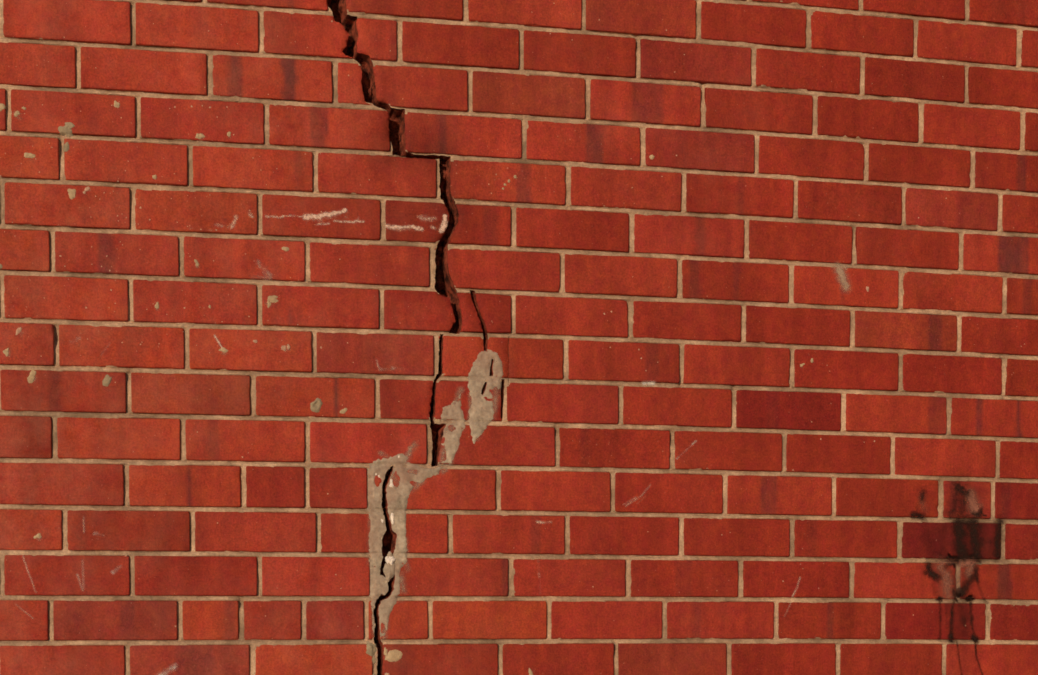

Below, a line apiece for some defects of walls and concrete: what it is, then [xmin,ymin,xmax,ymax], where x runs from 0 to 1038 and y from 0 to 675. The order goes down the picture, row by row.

crack [328,0,509,467]
crack [373,466,397,675]
water stain [940,598,983,675]
water stain [953,517,1003,563]